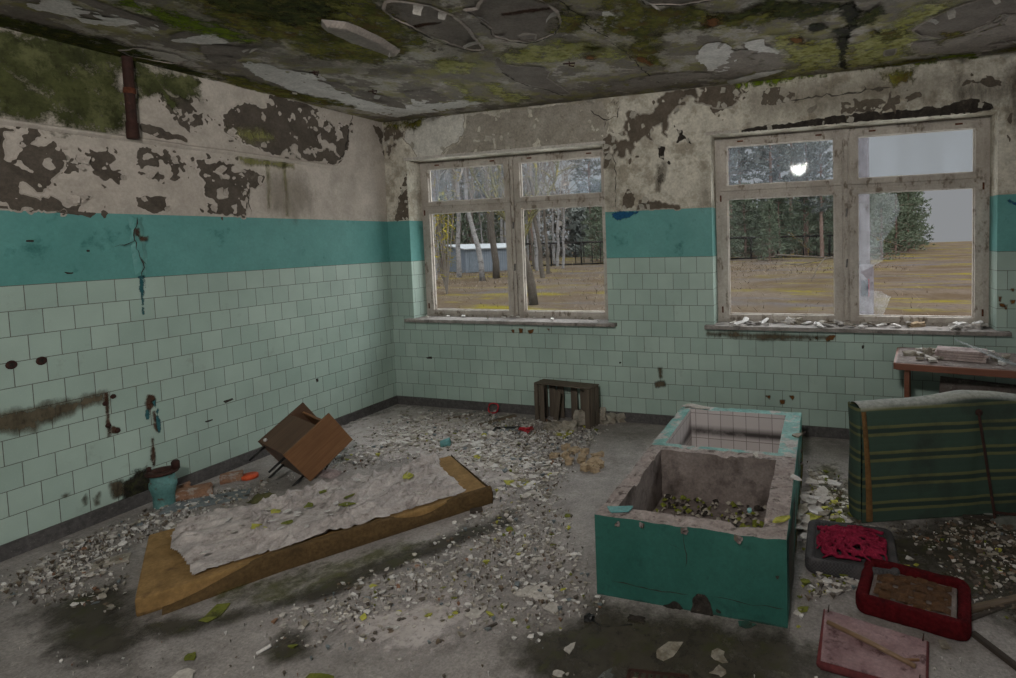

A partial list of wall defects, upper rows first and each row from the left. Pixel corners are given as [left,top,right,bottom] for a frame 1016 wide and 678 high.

peeling [321,19,400,57]
leakage [808,4,864,69]
peeling [373,82,748,169]
peeling [761,87,795,106]
peeling [841,86,922,124]
flaking render [932,98,993,116]
peeling [0,126,127,218]
peeling [136,92,353,220]
peeling [395,174,409,222]
peeling [622,189,681,211]
rust [104,393,119,436]